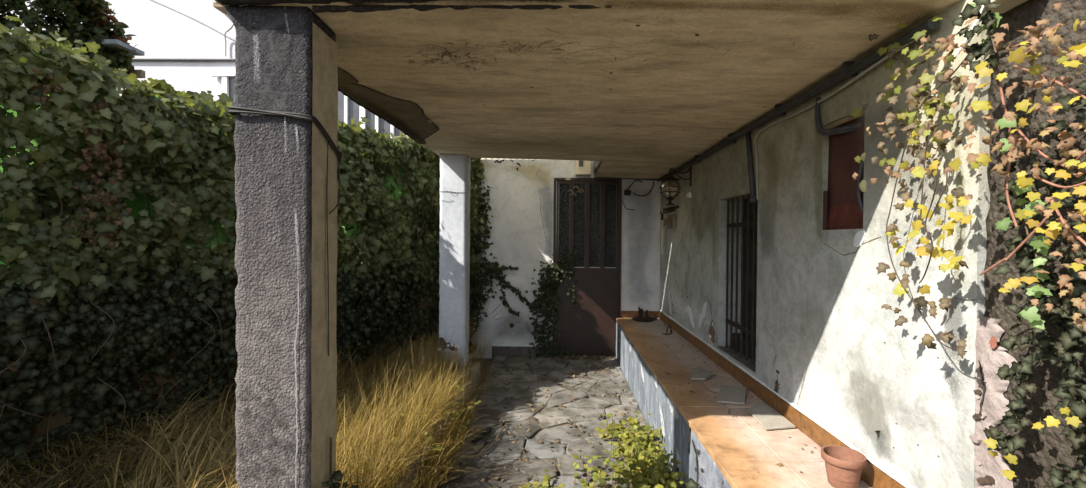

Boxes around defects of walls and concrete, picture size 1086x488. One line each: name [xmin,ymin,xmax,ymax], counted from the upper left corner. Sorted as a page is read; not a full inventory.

peeling [338,67,440,145]